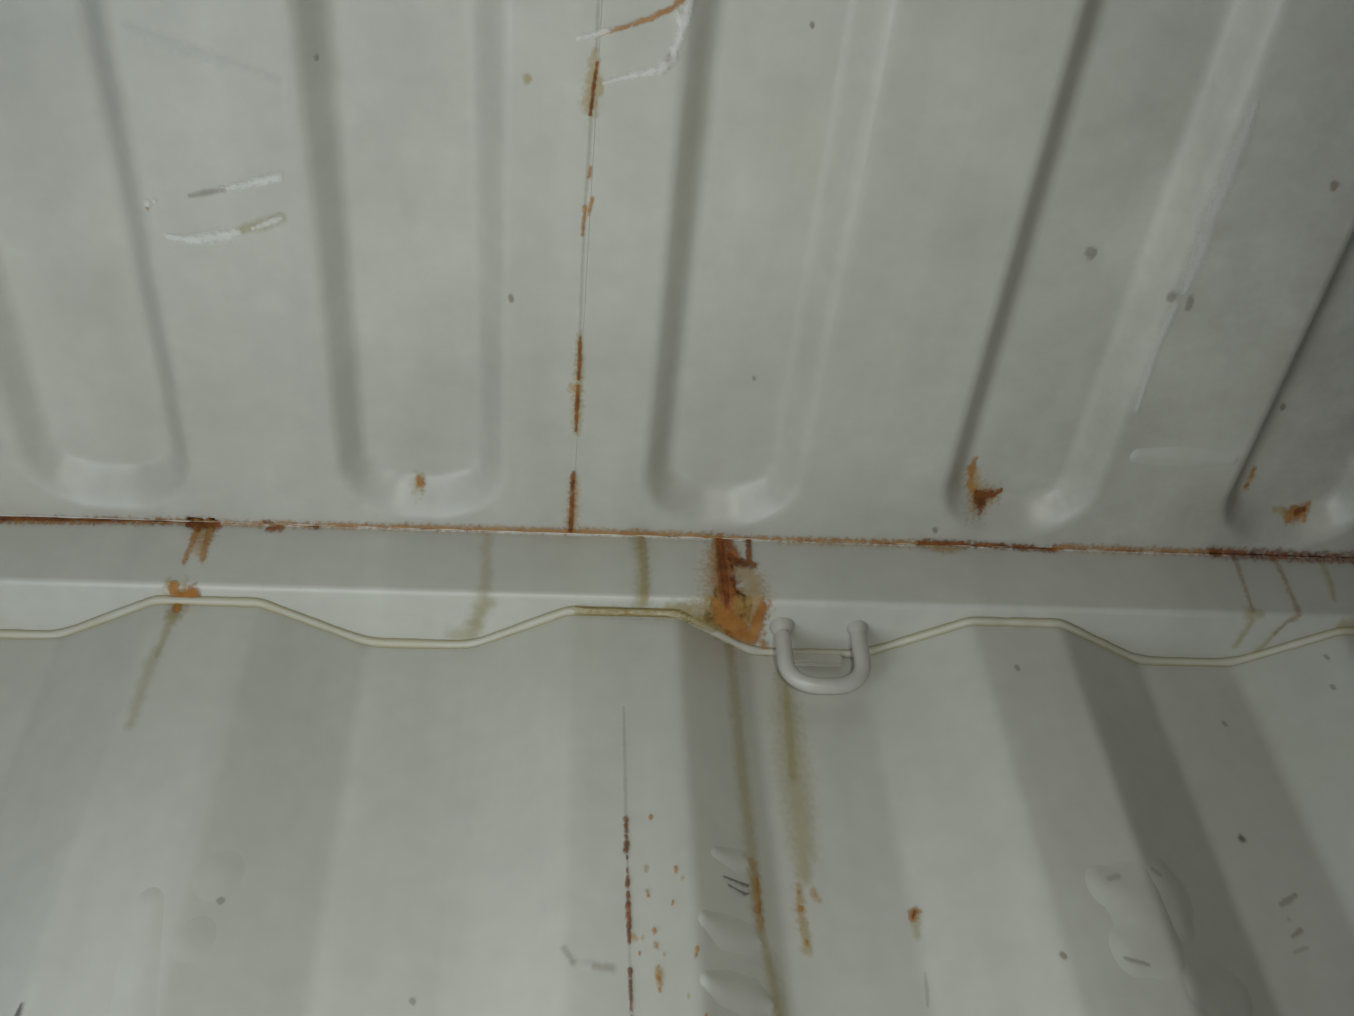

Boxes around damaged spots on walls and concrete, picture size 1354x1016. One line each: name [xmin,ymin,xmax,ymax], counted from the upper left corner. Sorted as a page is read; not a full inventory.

rust [589,62,598,116]
rust [574,337,582,432]
rust [967,458,1003,514]
rust [0,472,1354,649]
rust [623,816,640,1011]